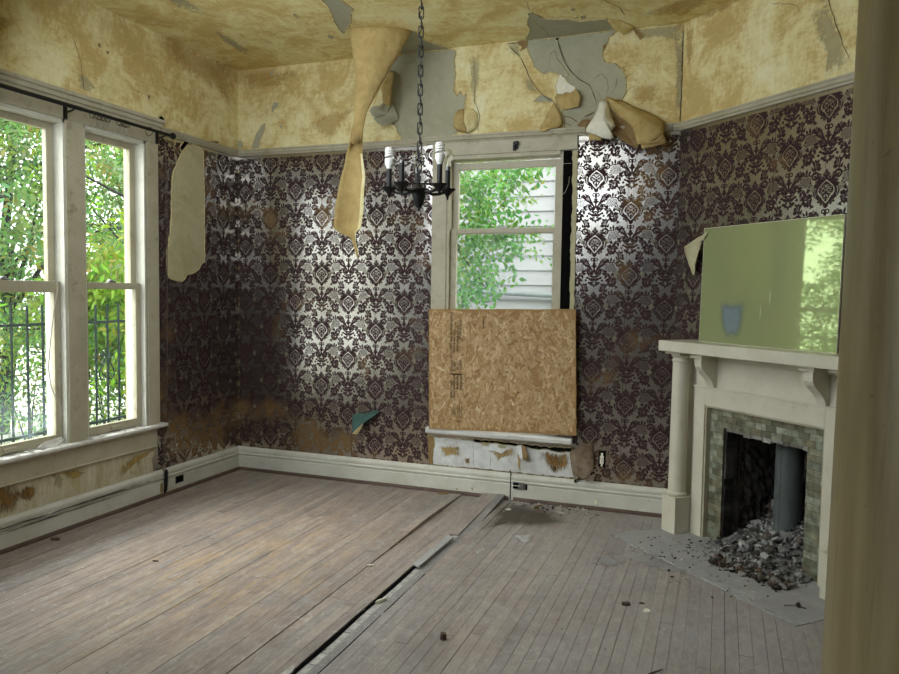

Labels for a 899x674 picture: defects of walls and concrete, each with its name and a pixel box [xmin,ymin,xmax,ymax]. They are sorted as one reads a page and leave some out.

peeling [322,0,354,39]
crack [506,42,552,101]
peeling [517,8,627,128]
crack [526,2,639,103]
peeling [166,140,219,282]
flaking render [0,447,155,519]
flaking render [433,437,578,483]
crack [318,567,432,674]